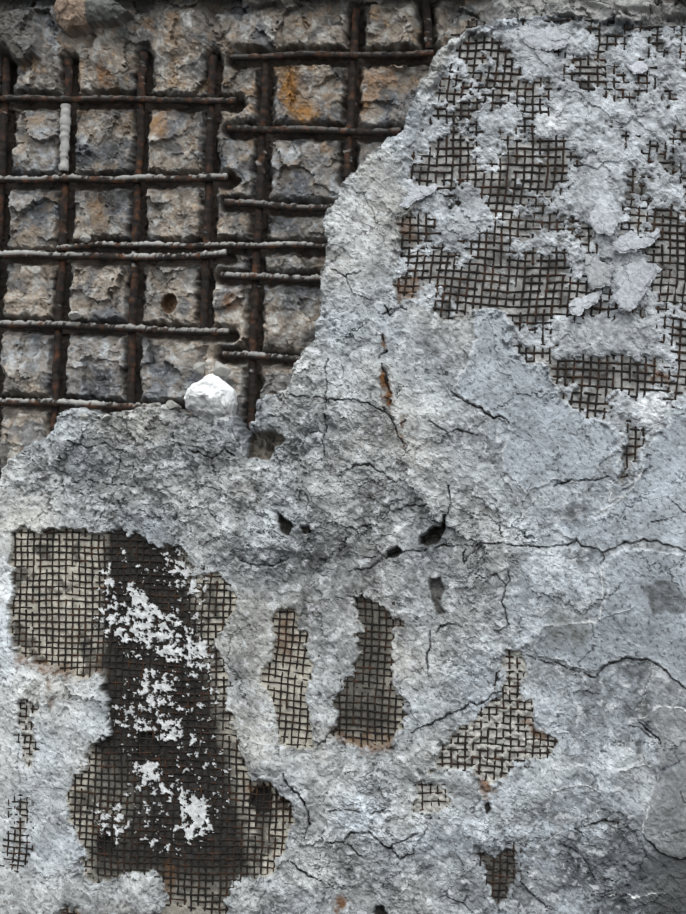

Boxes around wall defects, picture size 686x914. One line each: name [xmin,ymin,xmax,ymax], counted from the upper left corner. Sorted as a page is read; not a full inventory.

corrosion [281,71,315,123]
crack [286,306,406,449]
corrosion [379,371,392,405]
crack [455,394,505,419]
spalling [392,17,686,688]
crack [341,505,682,631]
spalling [7,526,296,914]
spalling [260,609,320,752]
spalling [330,595,409,751]
crack [414,692,496,732]
spalling [412,650,563,819]
crack [285,780,418,858]